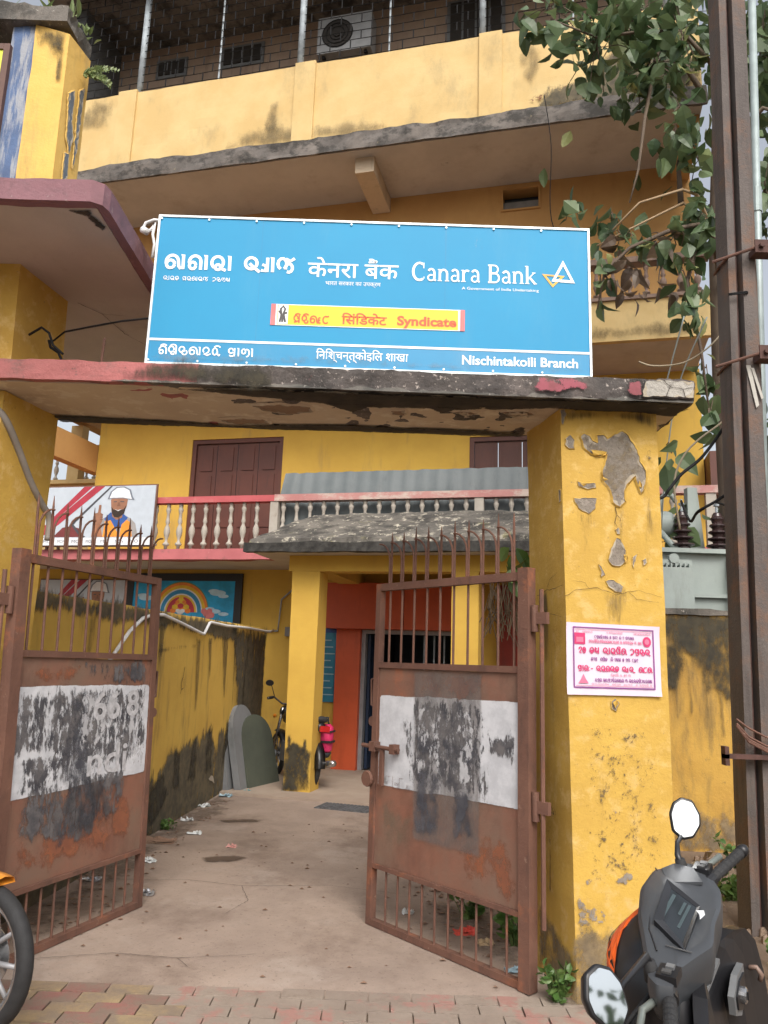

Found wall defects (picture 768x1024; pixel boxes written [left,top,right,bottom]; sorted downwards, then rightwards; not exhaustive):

leakage [242,112,291,142]
leakage [135,361,271,389]
spalling [498,409,536,418]
spalling [641,378,695,400]
peeling [558,409,647,514]
peeling [598,527,647,593]
crack [538,577,659,617]
leakage [665,614,731,701]
leakage [146,723,258,844]
leakage [282,736,311,791]
leakage [16,856,135,925]
peeling [578,899,606,926]